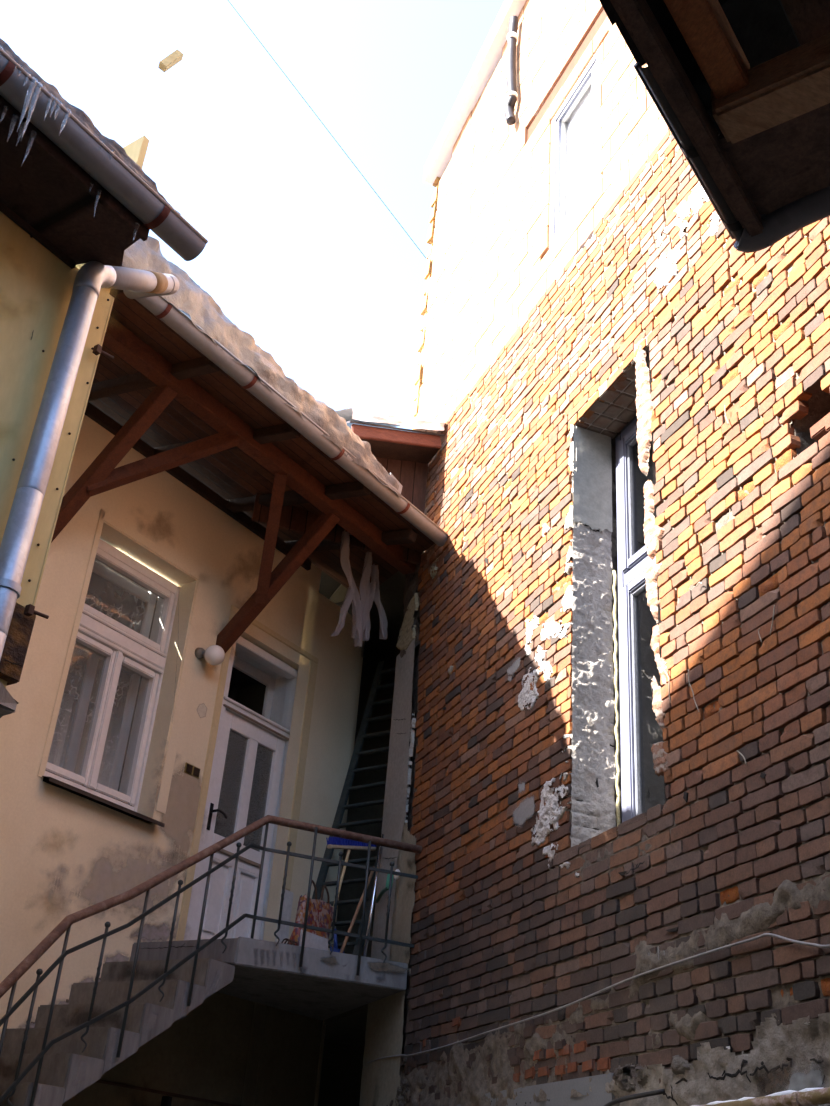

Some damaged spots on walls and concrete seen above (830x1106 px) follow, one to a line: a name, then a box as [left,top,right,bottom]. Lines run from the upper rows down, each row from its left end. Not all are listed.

peeling [707,212,720,236]
peeling [654,219,689,294]
spalling [793,389,830,445]
spalling [775,449,797,472]
spalling [518,424,577,711]
spalling [634,339,670,777]
spalling [559,733,575,781]
leakage [79,767,201,913]
spalling [820,978,830,996]
crack [663,1057,825,1105]
spalling [755,1062,791,1095]